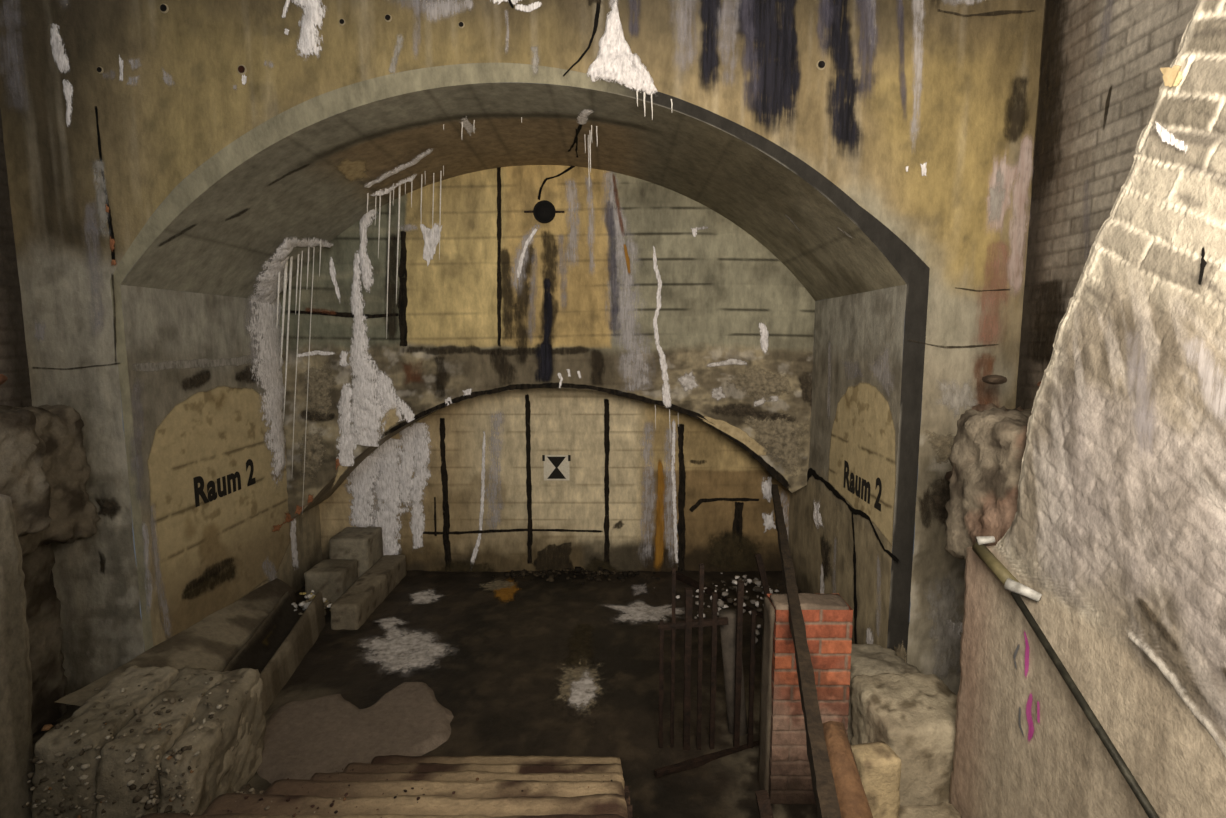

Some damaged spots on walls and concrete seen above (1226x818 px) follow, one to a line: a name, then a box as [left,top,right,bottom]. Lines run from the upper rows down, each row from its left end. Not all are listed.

efflorescence [282,0,326,58]
crack [563,0,601,76]
efflorescence [587,0,657,119]
leakage [700,0,800,129]
crack [538,124,582,200]
spalling [296,350,348,485]
leakage [246,209,432,556]
peeling [380,408,399,432]
leakage [490,173,679,567]
spalling [678,372,697,391]
spalling [699,359,812,477]
crack [805,468,900,644]